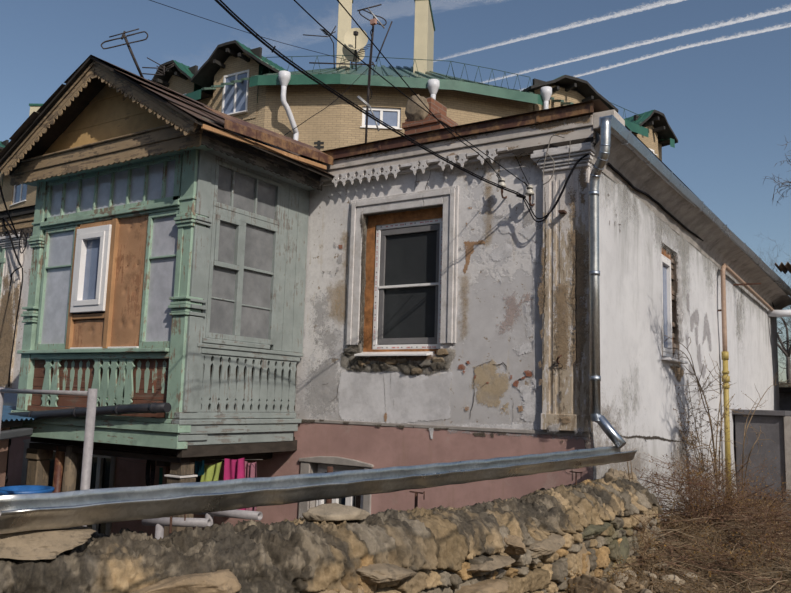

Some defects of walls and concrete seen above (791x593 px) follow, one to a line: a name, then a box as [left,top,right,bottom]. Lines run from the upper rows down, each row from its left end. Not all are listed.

flaking render [301,211,542,438]
peeling [496,230,589,370]
flaking render [547,391,590,443]
crack [620,434,681,442]